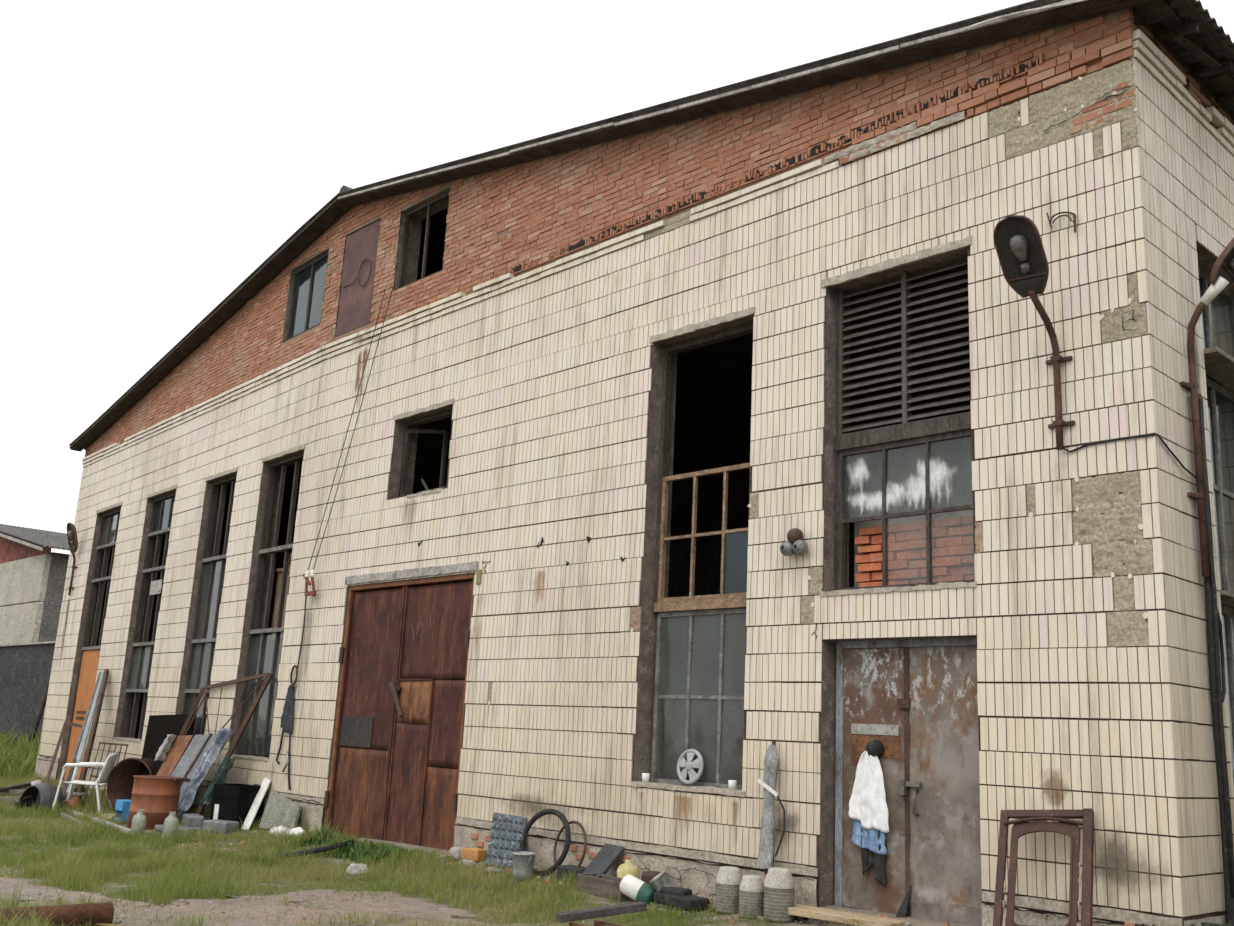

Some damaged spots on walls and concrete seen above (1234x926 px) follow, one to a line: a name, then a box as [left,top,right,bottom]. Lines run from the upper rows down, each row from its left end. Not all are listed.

spalling [988,59,1139,161]
peeling [1099,273,1150,343]
peeling [1072,471,1154,647]